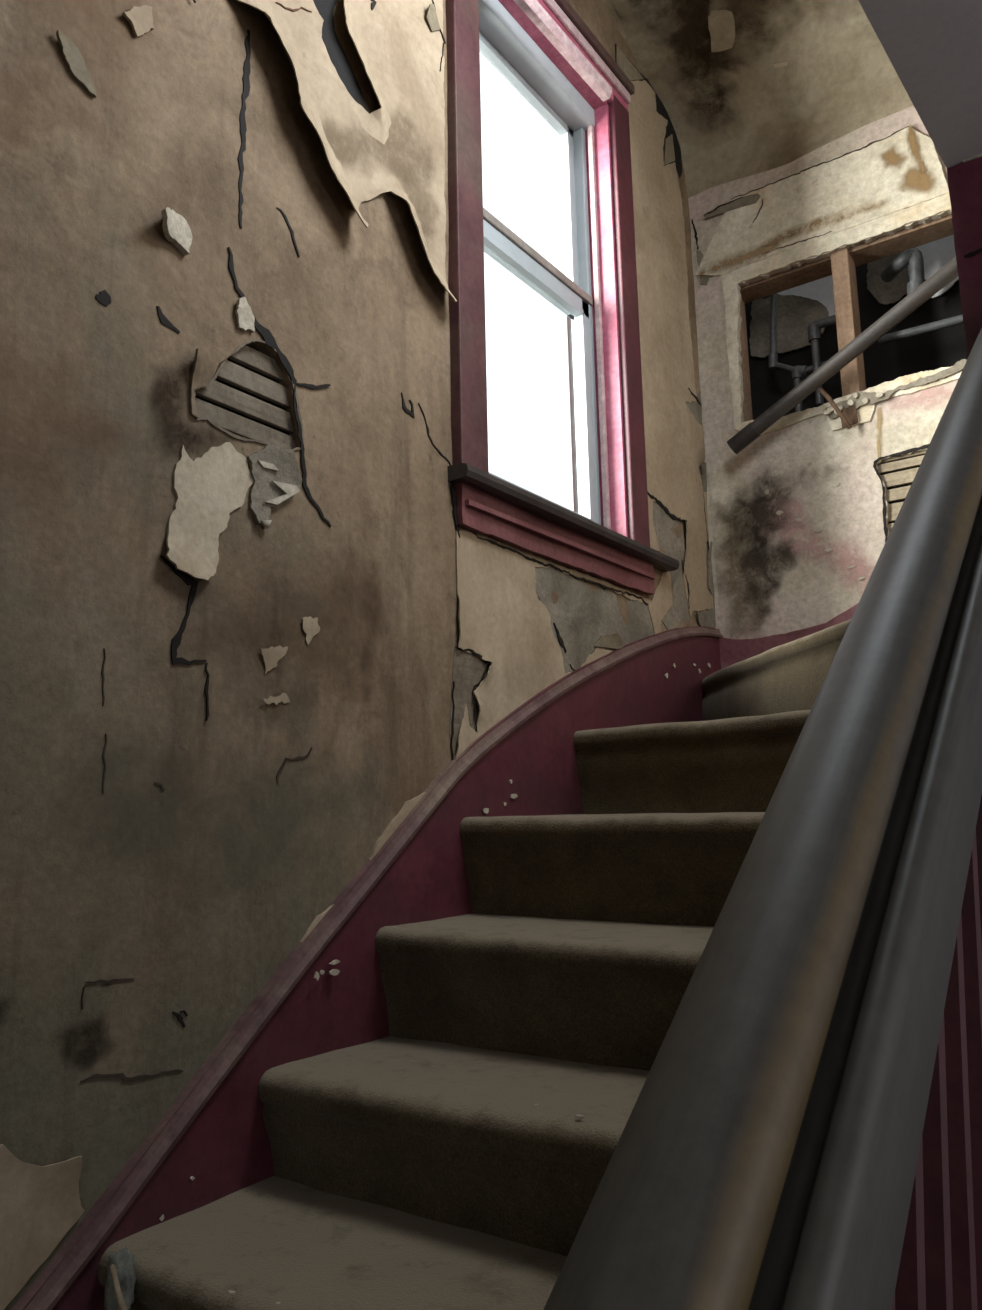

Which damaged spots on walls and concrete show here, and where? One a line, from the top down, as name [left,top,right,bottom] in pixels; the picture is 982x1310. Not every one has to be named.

crack [276,2,312,12]
water stain [652,0,730,125]
water stain [728,0,788,42]
peeling [161,207,193,256]
crack [228,29,331,527]
spalling [866,235,959,305]
crack [160,555,210,721]
spalling [166,442,302,581]
spalling [449,647,490,760]
spalling [535,491,716,674]
water stain [723,479,795,636]
peeling [0,1144,84,1310]